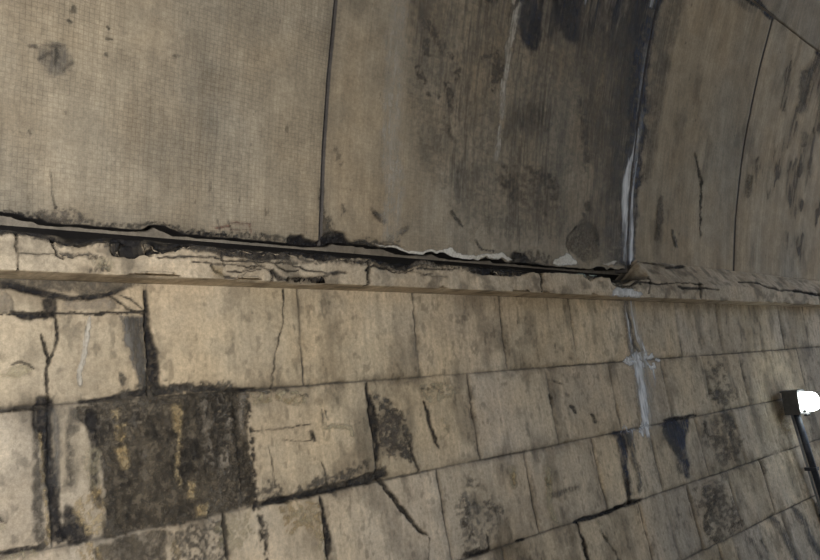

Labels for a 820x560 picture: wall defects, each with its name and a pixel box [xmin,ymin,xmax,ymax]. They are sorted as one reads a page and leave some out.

leakage [481,0,677,268]
leakage [774,125,820,213]
peeling [553,202,599,266]
leakage [119,316,147,390]
crack [157,256,323,389]
spalling [270,270,345,283]
flaking render [288,245,543,292]
leakage [613,288,641,298]
crack [613,262,719,436]
crack [423,400,439,448]
leakage [662,414,696,478]
crack [376,478,430,542]